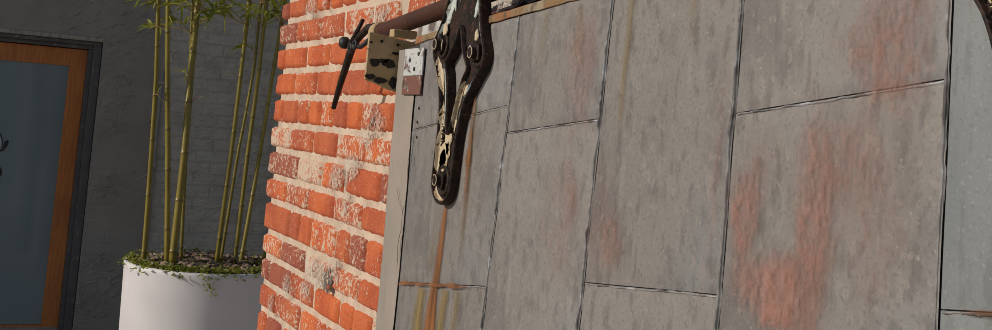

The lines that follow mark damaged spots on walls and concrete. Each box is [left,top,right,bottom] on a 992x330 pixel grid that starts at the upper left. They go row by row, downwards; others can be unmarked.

rust [399,207,465,330]